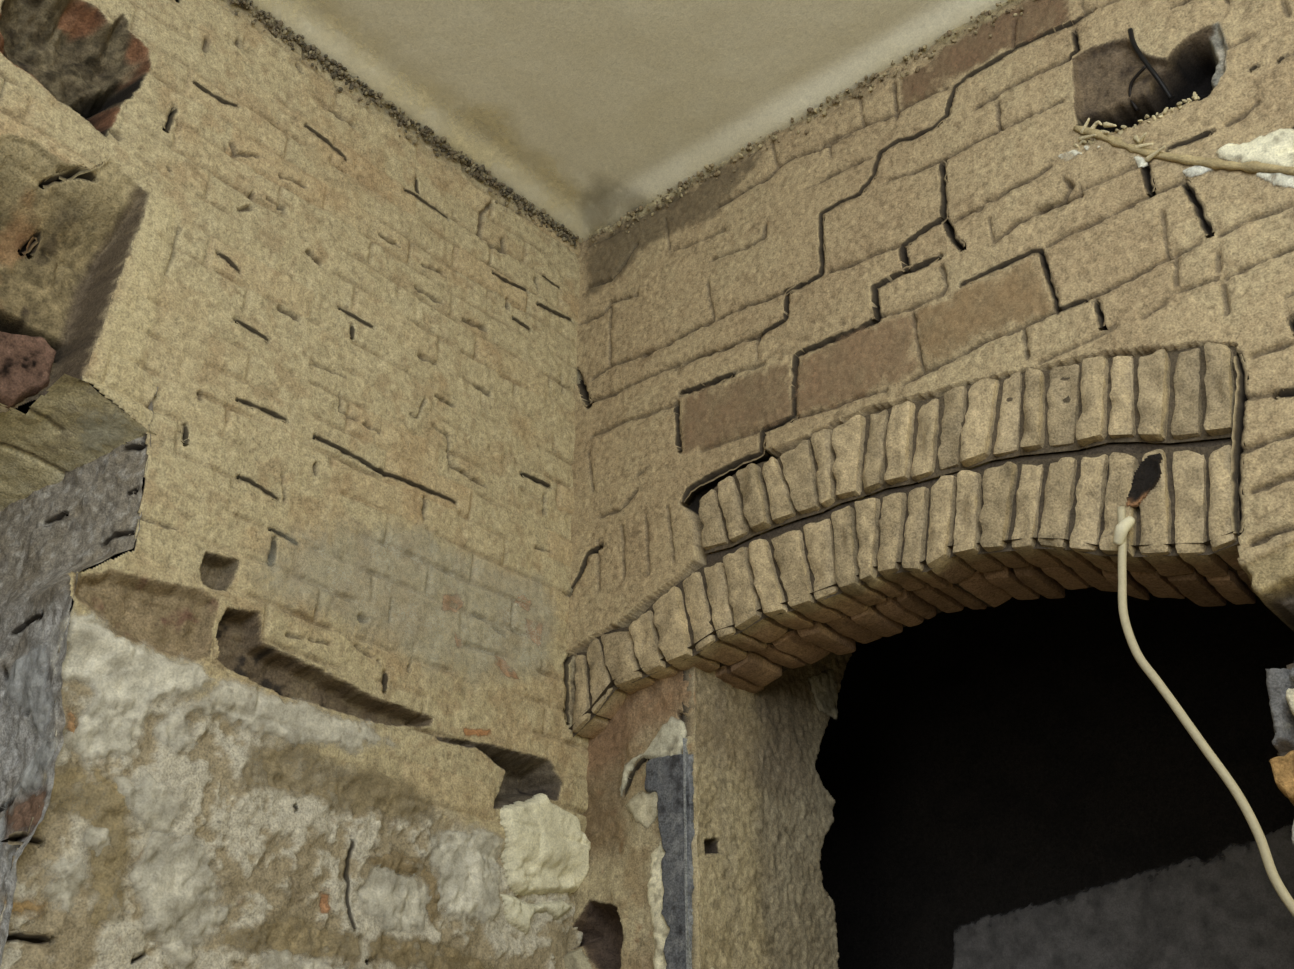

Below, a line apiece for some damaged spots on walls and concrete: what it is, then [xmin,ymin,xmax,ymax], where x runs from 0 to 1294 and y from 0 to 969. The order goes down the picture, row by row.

spalling [0,0,154,139]
flaking render [231,0,1036,249]
leakage [589,157,754,292]
crack [673,10,1107,506]
spalling [1059,19,1231,159]
crack [1140,129,1215,237]
crack [576,369,594,407]
flaking render [0,614,393,841]
flaking render [620,717,687,828]
flaking render [116,770,228,969]
flaking render [358,728,626,969]
flaking render [647,841,670,969]